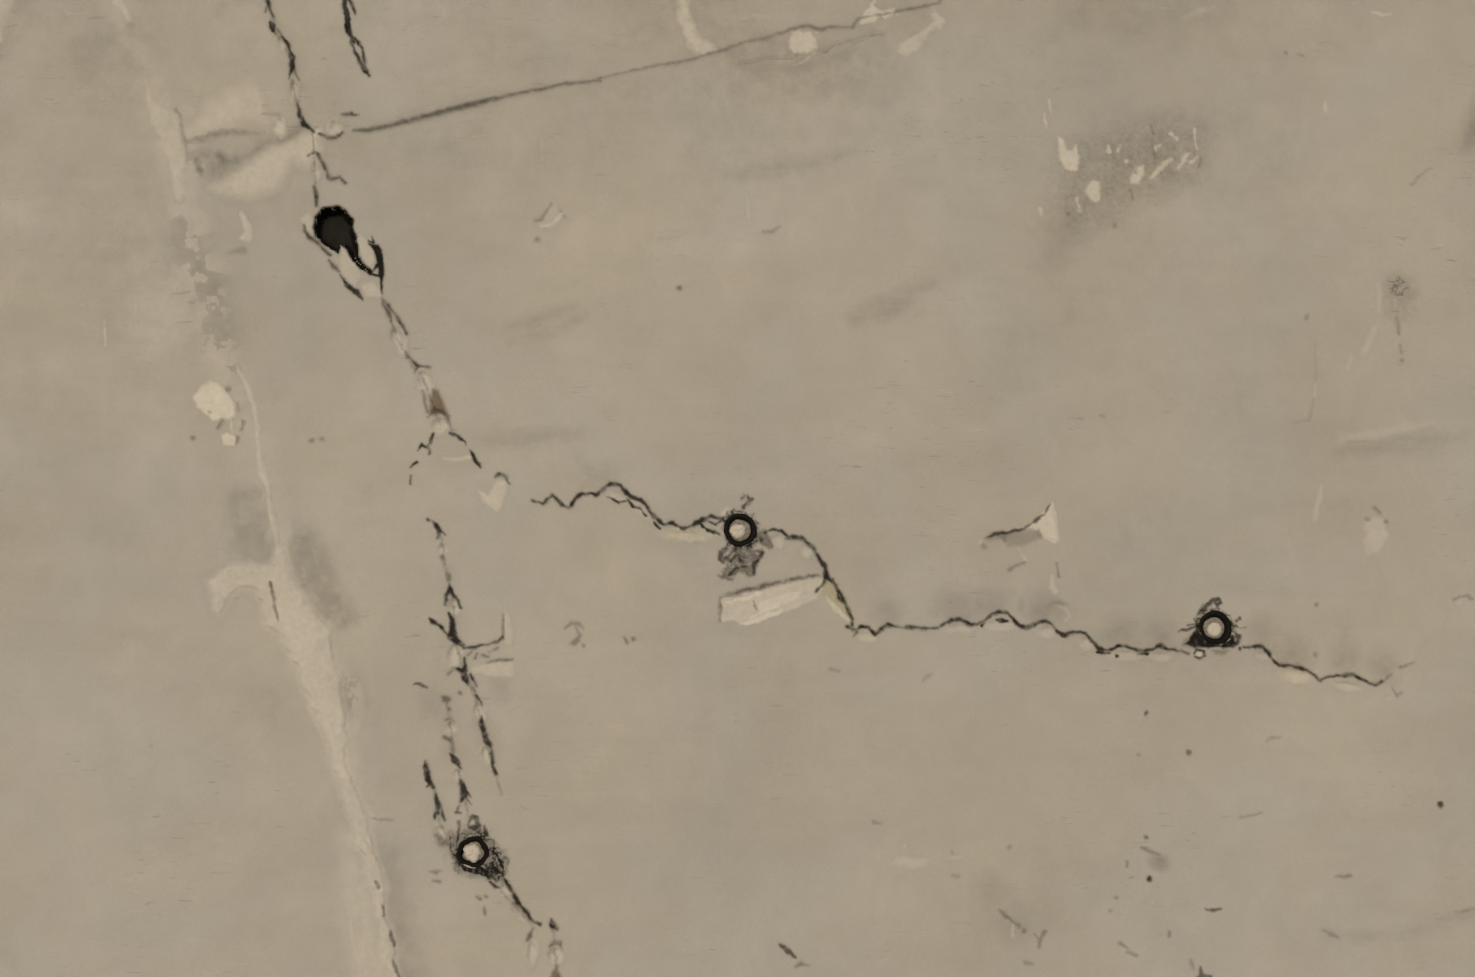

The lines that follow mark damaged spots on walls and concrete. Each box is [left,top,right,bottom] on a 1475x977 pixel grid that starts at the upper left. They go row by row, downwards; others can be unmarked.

crack [263,0,952,210]
peeling [298,211,313,234]
peeling [338,232,381,301]
peeling [190,378,247,448]
crack [378,295,726,862]
spalling [716,527,823,627]
crack [762,526,1191,669]
peeling [976,500,1062,597]
crack [1241,607,1416,704]
crack [474,876,566,977]